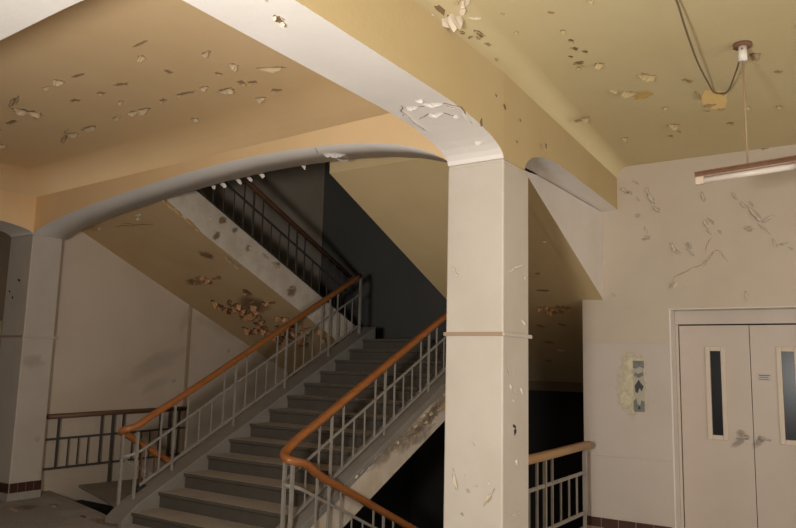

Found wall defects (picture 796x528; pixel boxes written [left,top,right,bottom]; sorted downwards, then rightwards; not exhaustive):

peeling [561,29,588,70]
peeling [0,96,42,131]
peeling [160,63,258,103]
peeling [400,100,483,131]
peeling [682,78,727,112]
peeling [210,289,327,351]